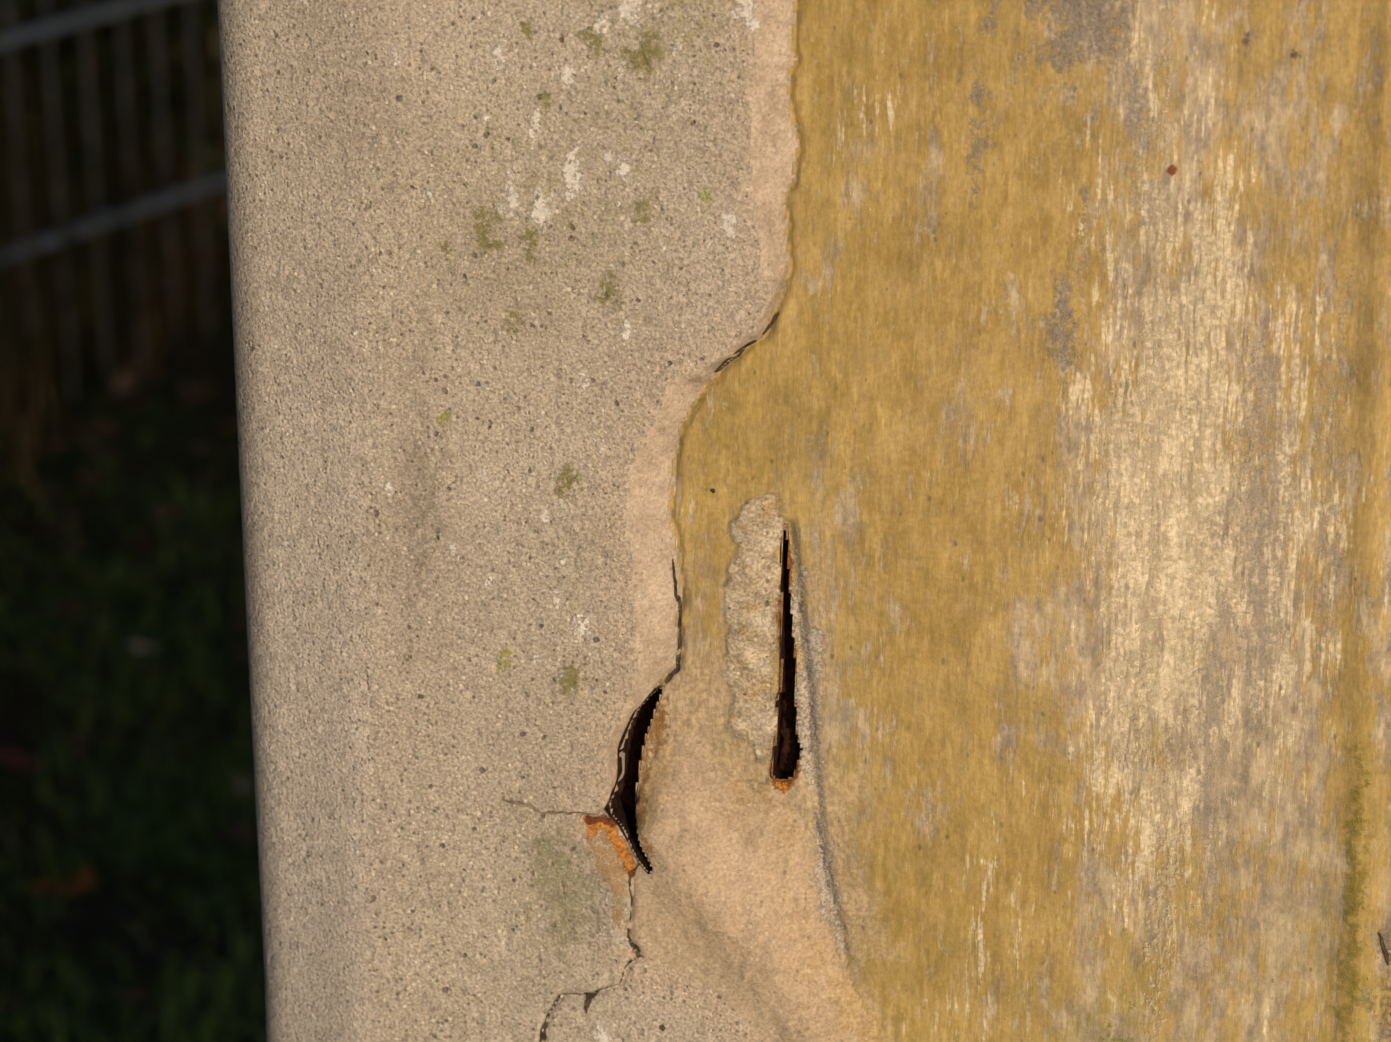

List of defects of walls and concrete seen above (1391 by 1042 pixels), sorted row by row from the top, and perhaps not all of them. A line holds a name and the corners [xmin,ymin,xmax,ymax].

spalling [600,0,1391,1042]
corrosion [769,523,803,795]
corrosion [580,696,669,929]
crack [539,863,642,1042]